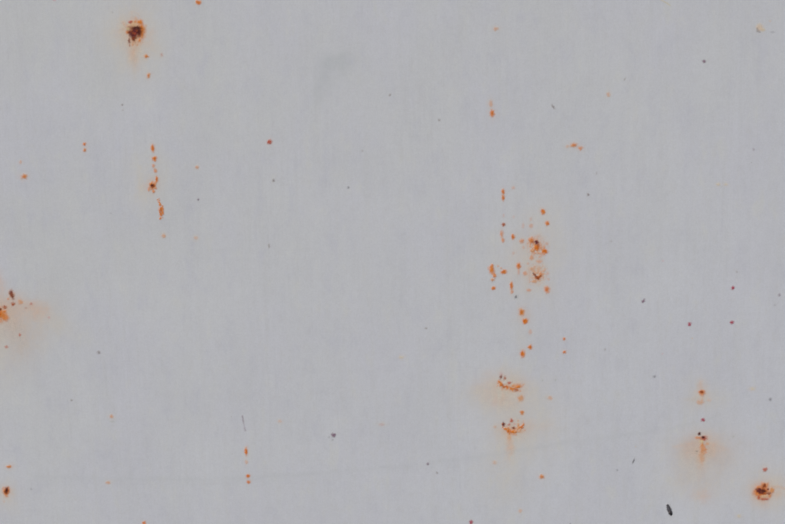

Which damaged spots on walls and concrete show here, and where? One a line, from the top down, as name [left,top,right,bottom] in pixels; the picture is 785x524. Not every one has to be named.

corrosion [504,296,544,358]
corrosion [631,403,785,524]